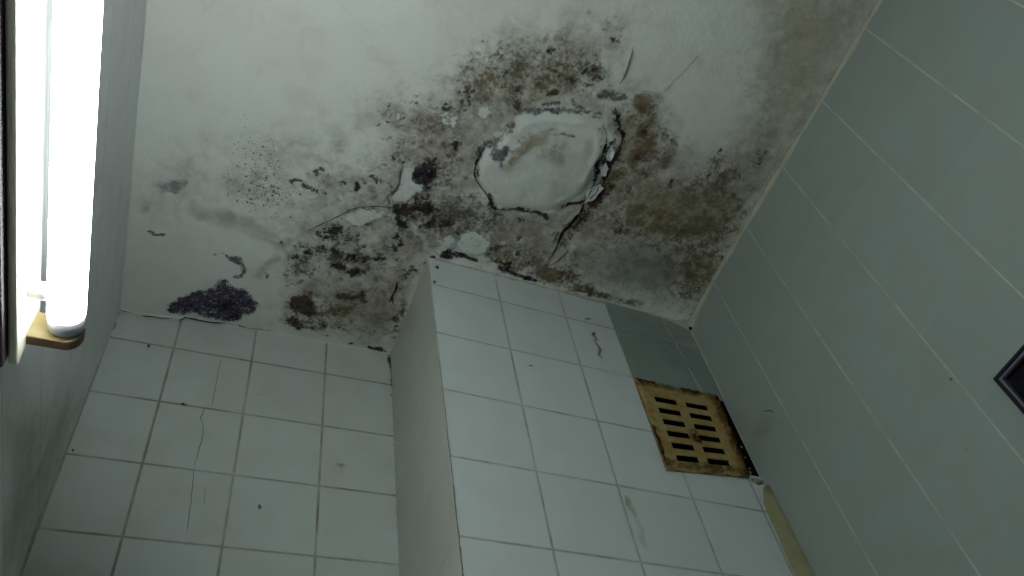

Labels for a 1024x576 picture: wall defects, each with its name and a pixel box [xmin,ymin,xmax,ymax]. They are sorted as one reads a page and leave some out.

damp [166,254,258,322]
damp [226,115,329,218]
crack [308,168,402,232]
peeling [392,166,425,203]
peeling [437,230,492,255]
damp [284,39,746,368]
crack [549,48,699,260]
crack [186,360,221,534]
corrosion [635,378,750,476]